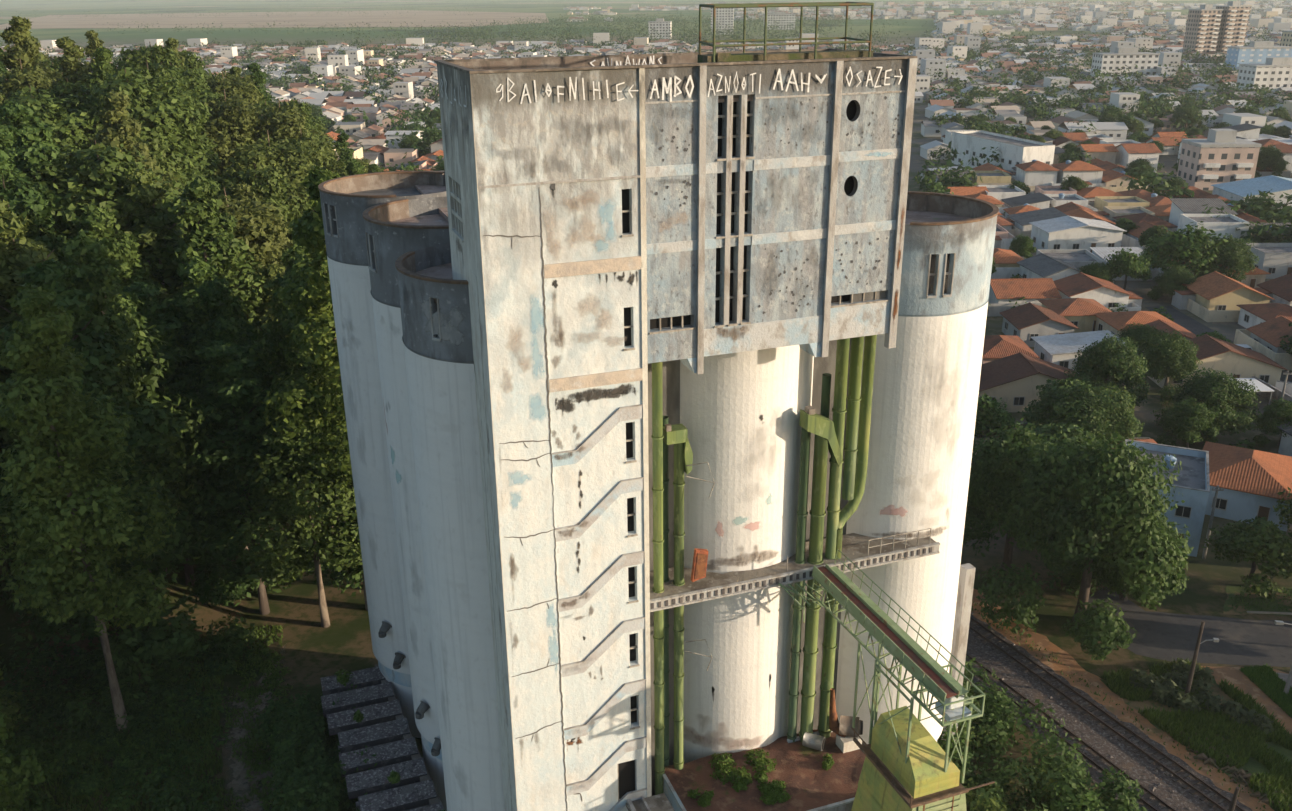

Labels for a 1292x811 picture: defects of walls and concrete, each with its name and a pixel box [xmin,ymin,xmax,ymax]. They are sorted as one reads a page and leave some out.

crack [473,189,582,803]